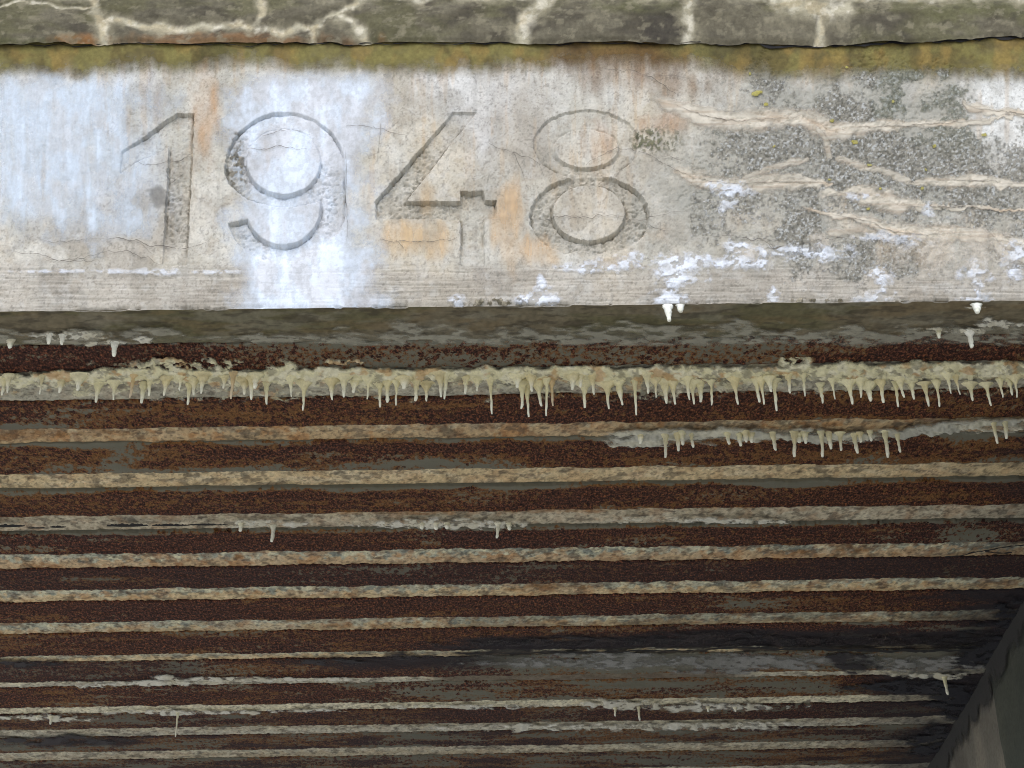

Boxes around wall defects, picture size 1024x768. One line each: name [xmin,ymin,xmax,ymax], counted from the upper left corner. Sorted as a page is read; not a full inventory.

crack [586,147,1023,249]
efflorescence [234,242,1024,348]
efflorescence [0,328,1024,417]
efflorescence [607,419,1024,458]